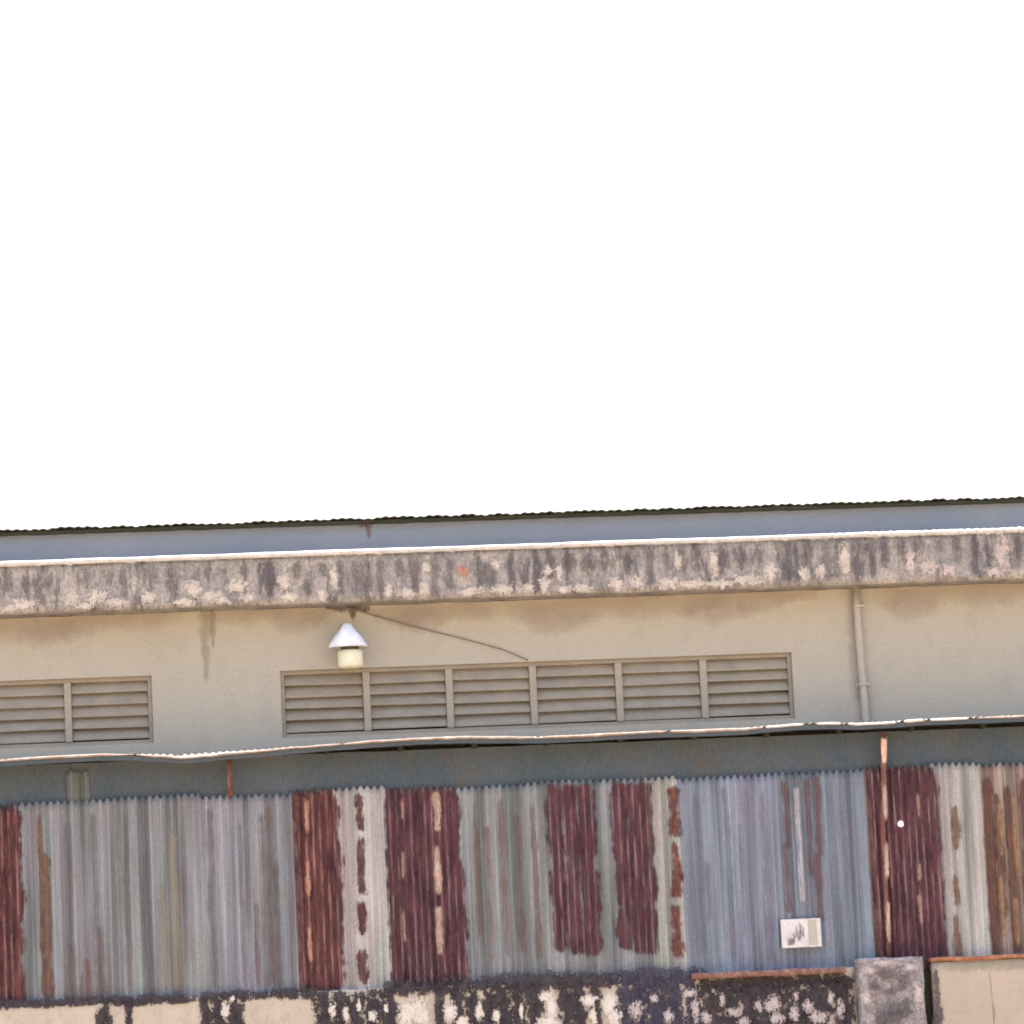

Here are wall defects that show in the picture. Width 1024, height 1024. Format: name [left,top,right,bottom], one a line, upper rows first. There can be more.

leakage [240,559,275,602]
leakage [505,545,702,594]
leakage [714,543,765,578]
leakage [783,537,903,584]
leakage [918,534,991,577]
rust [0,809,54,1002]
rust [293,790,370,991]
leakage [0,879,857,1024]
rust [384,789,518,985]
rust [520,783,603,957]
rust [609,780,685,958]
rust [867,766,962,965]